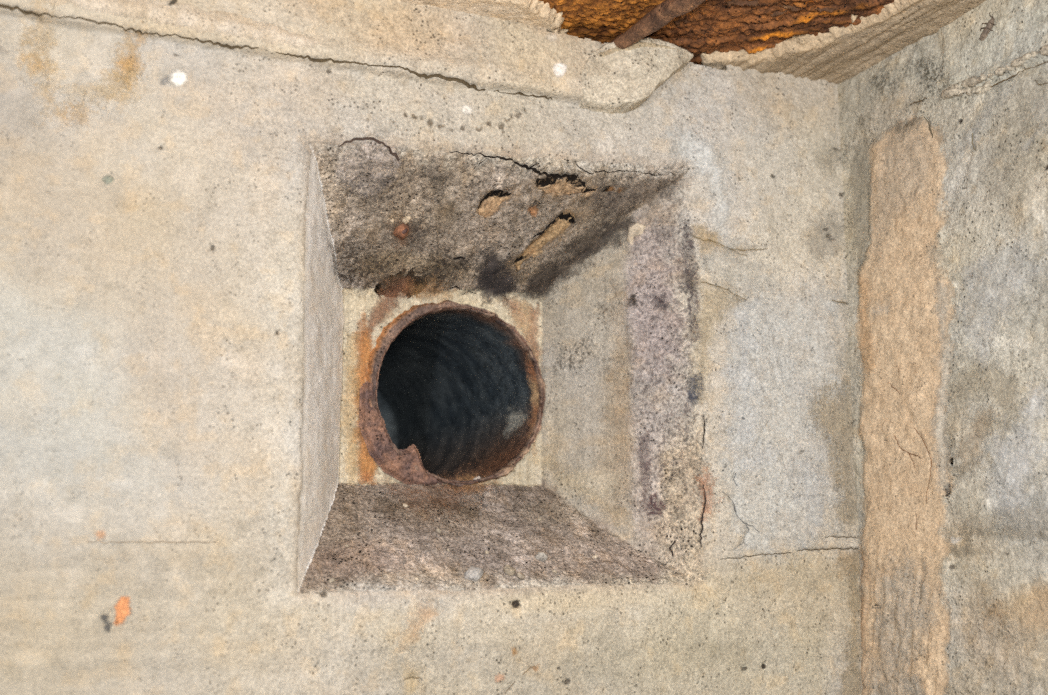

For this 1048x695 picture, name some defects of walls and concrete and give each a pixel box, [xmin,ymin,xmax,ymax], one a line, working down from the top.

crack [0,4,552,99]
corrosion [609,0,706,49]
spalling [478,190,519,217]
spalling [512,210,587,271]
spalling [535,178,593,197]
water stain [683,226,700,342]
corrosion [354,282,411,483]
water stain [688,373,704,402]
water stain [640,433,665,514]
crack [669,473,858,560]